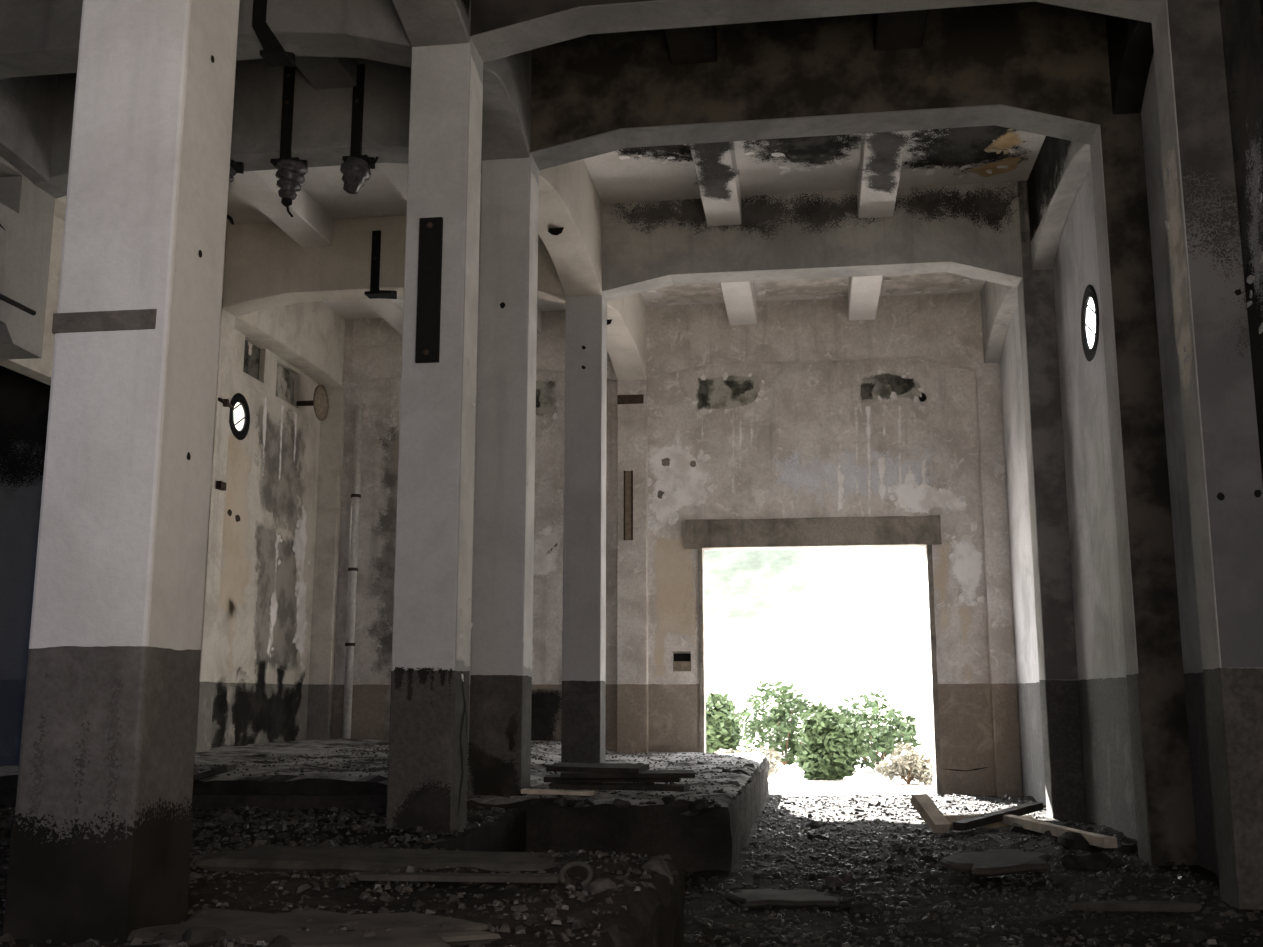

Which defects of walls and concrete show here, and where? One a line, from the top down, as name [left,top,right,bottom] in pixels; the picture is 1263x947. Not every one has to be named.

peeling [618,155,694,168]
peeling [771,152,852,175]
leakage [1219,0,1263,483]
leakage [210,398,309,748]
peeling [523,170,561,670]
peeling [648,372,765,535]
spalling [854,370,985,606]